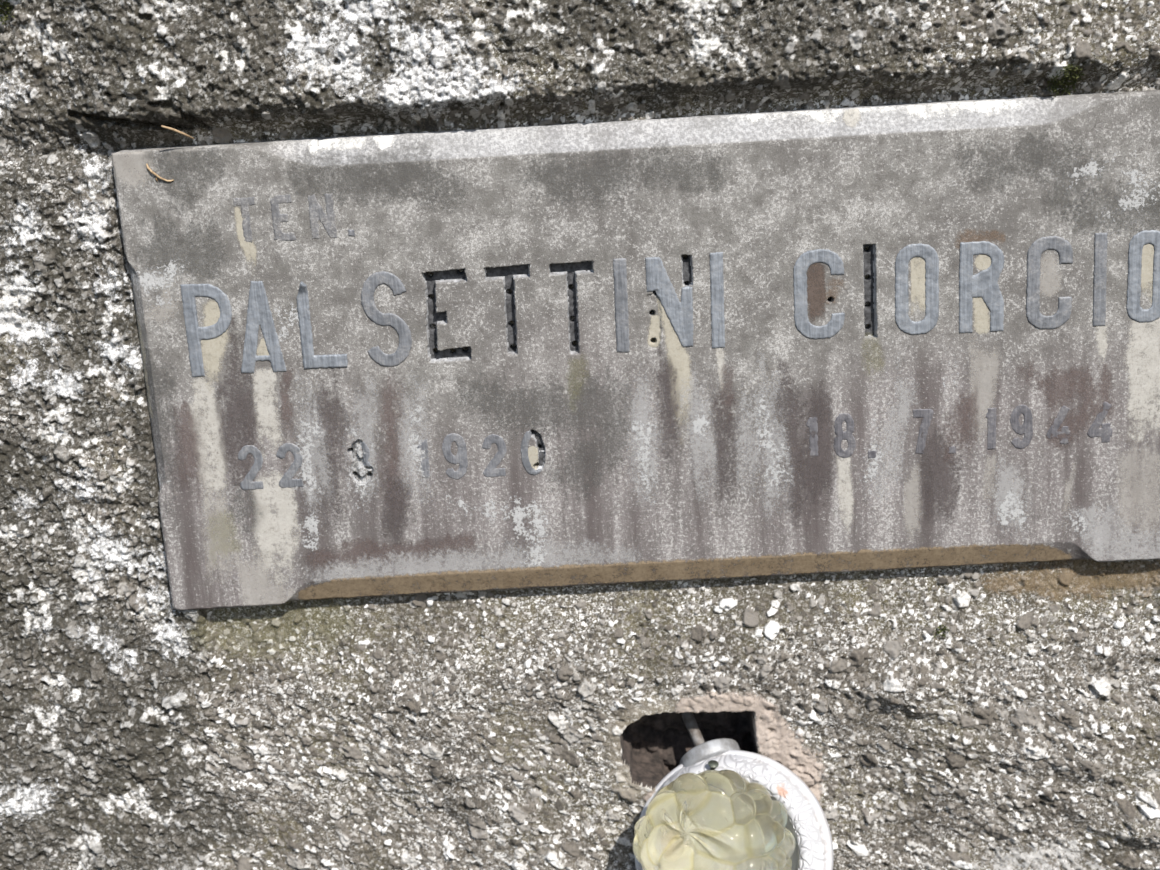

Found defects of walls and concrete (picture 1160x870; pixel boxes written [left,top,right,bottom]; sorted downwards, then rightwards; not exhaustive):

water stain [179,300,474,606]
water stain [528,446,539,470]
water stain [648,298,693,458]
water stain [711,348,738,498]
water stain [771,364,854,530]
water stain [904,351,998,533]
water stain [973,297,990,334]
water stain [975,254,992,270]
water stain [1019,323,1112,448]
water stain [1121,318,1160,532]
water stain [1141,244,1155,299]
spalling [620,710,758,789]